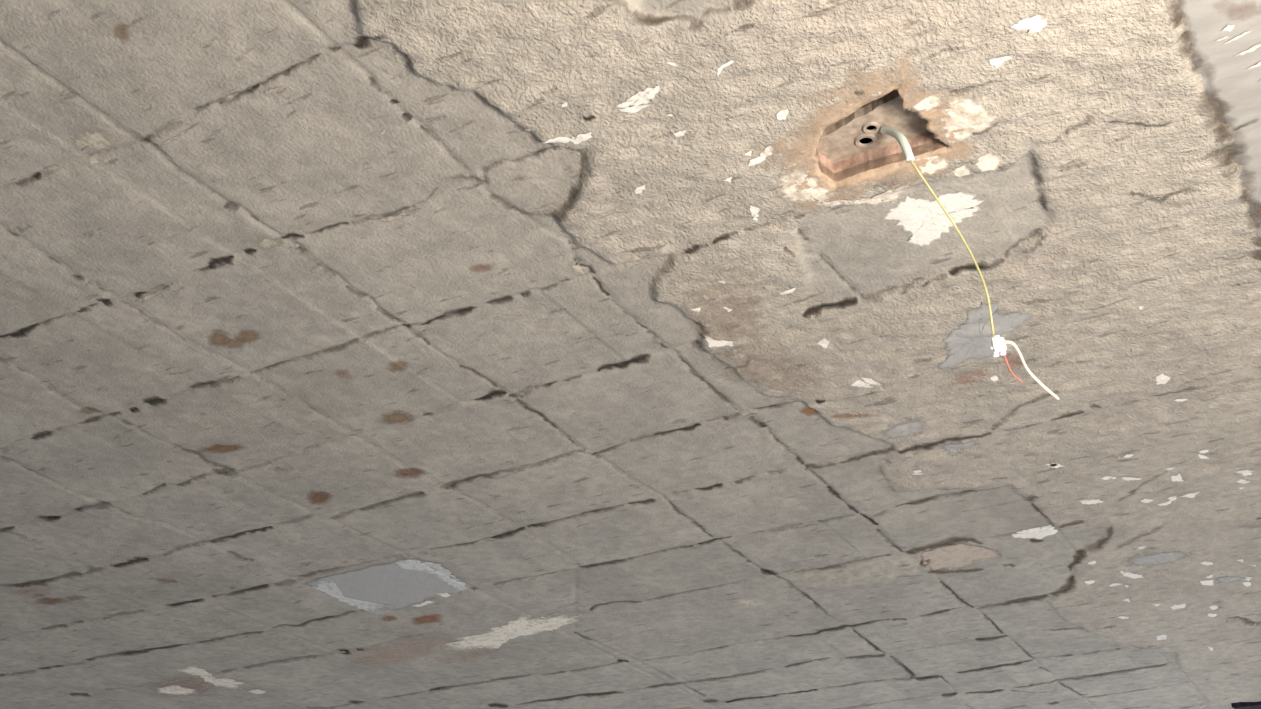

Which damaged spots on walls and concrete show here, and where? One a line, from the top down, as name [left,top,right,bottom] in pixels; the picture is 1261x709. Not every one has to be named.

spalling [744,61,970,205]
peeling [884,192,984,246]
crack [204,222,348,269]
crack [926,262,999,284]
crack [803,297,857,317]
corrosion [212,331,258,347]
corrosion [205,445,239,453]
corrosion [397,469,421,477]
corrosion [310,492,329,503]
crack [459,323,1146,708]
peeling [1011,525,1058,539]
spalling [921,543,1000,571]